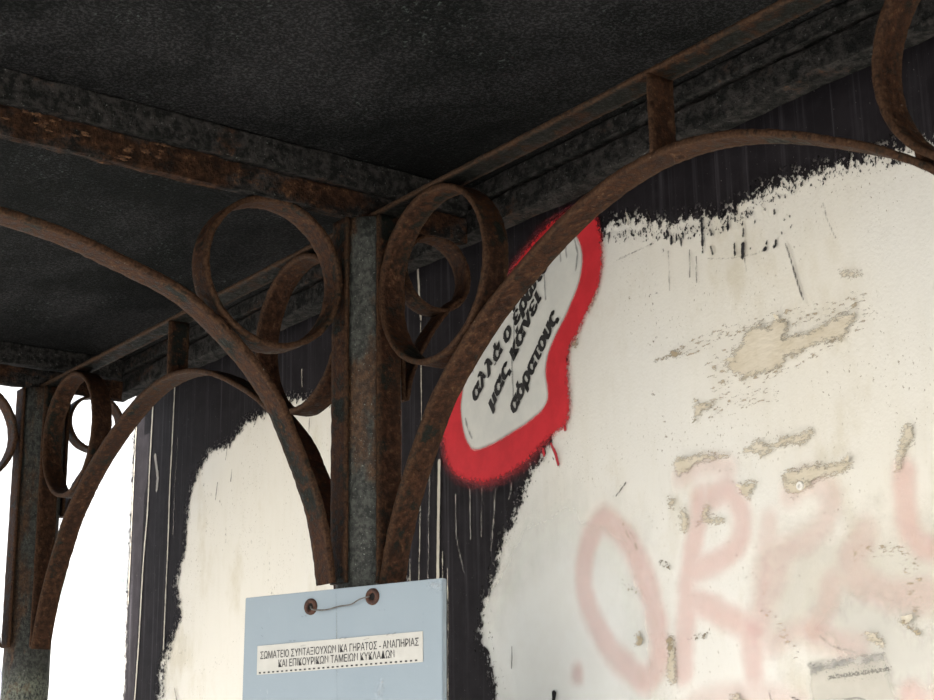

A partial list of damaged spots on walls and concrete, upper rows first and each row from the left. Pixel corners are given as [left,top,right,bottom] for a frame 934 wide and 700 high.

peeling [655,292,868,423]
peeling [672,427,813,477]
peeling [781,455,853,494]
peeling [894,423,913,473]